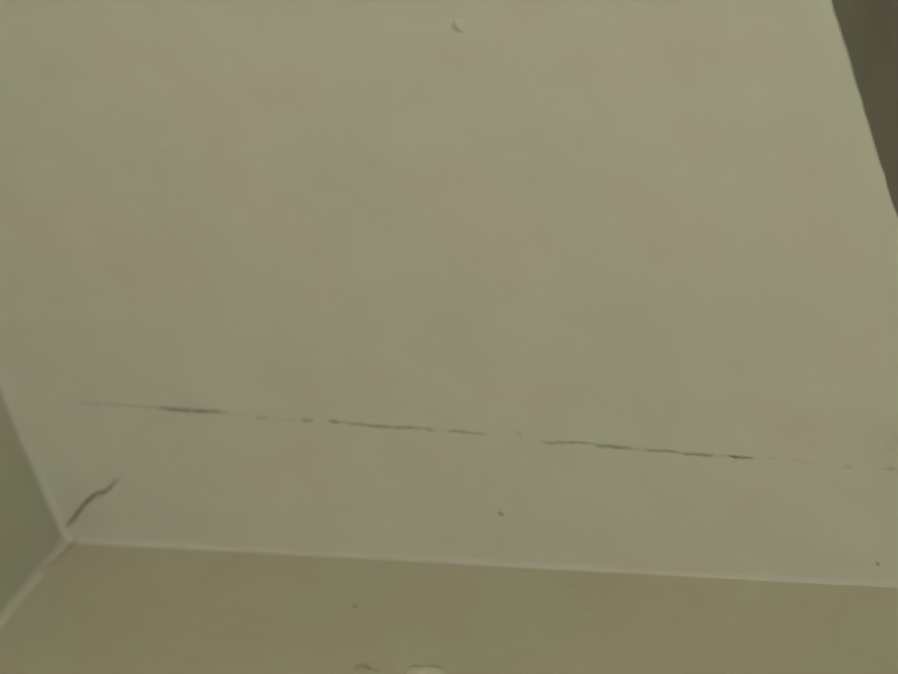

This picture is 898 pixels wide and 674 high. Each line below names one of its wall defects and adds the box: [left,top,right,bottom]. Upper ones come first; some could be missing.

crack [70,487,111,523]